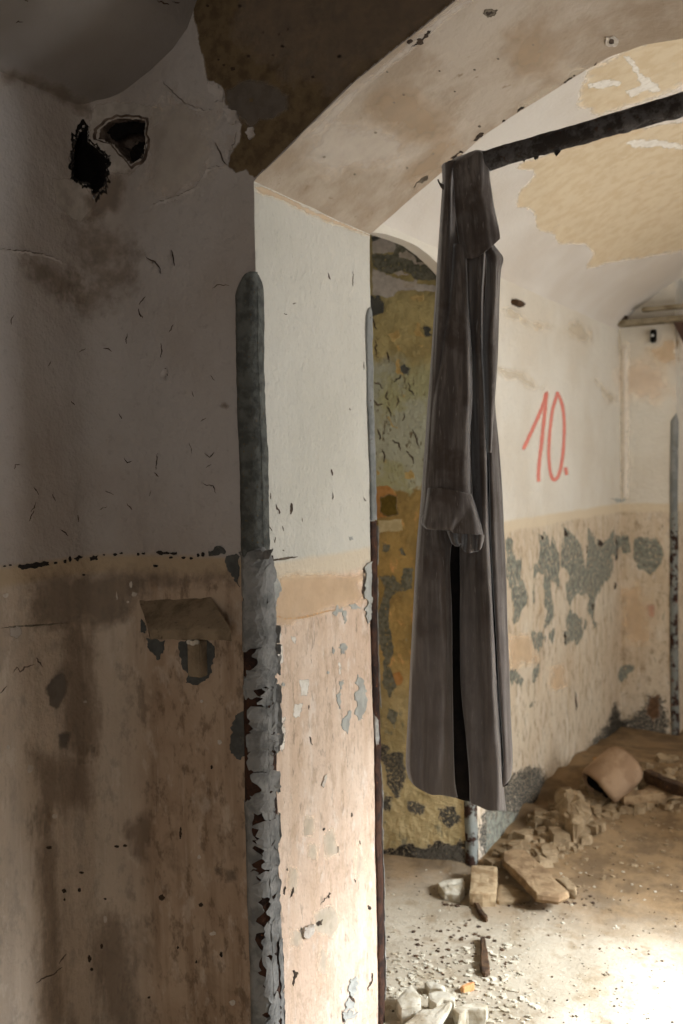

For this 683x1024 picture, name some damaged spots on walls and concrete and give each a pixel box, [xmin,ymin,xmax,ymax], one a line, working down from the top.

spalling [52,101,163,222]
flaking render [207,82,256,160]
flaking render [588,56,661,98]
flaking render [626,130,683,150]
peeling [370,233,436,375]
damp [46,672,67,708]
peeling [3,552,123,570]
peeling [327,519,413,746]
peeling [505,527,664,685]
peeling [137,526,310,1024]